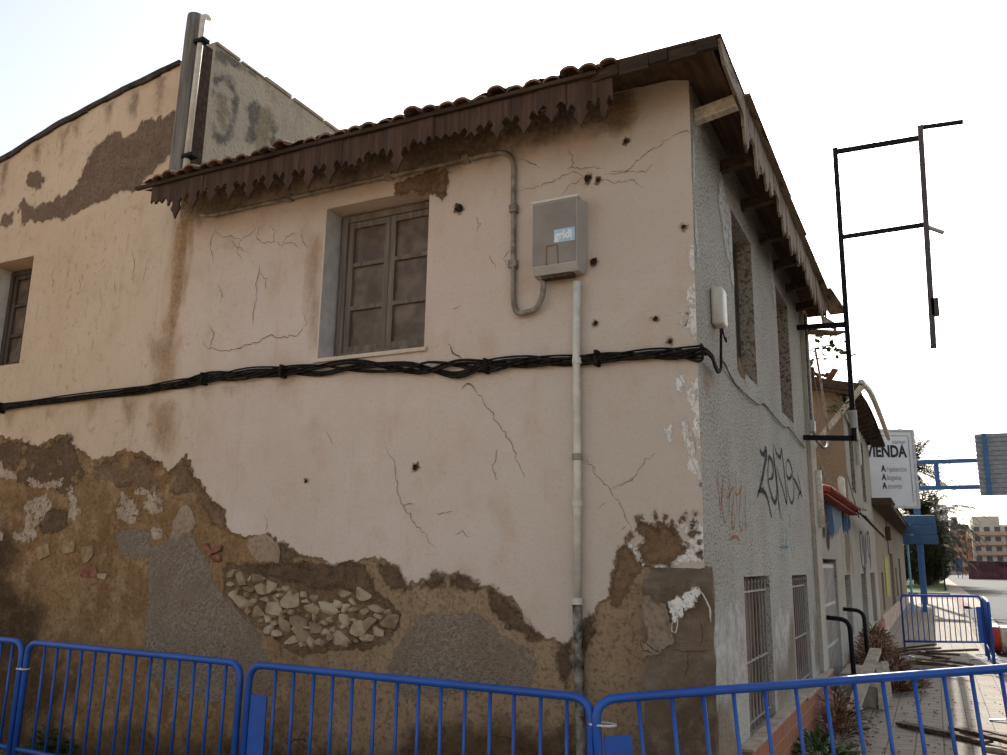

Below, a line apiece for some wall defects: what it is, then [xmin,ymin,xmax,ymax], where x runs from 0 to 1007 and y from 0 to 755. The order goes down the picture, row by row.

water stain [214,77,260,143]
water stain [181,95,626,217]
peeling [394,168,464,215]
crack [519,130,690,191]
crack [202,320,306,352]
crack [210,226,308,313]
spalling [678,245,697,340]
crack [462,383,524,480]
spalling [663,360,705,488]
peeling [0,434,704,755]
water stain [0,531,240,755]
water stain [401,726,576,755]